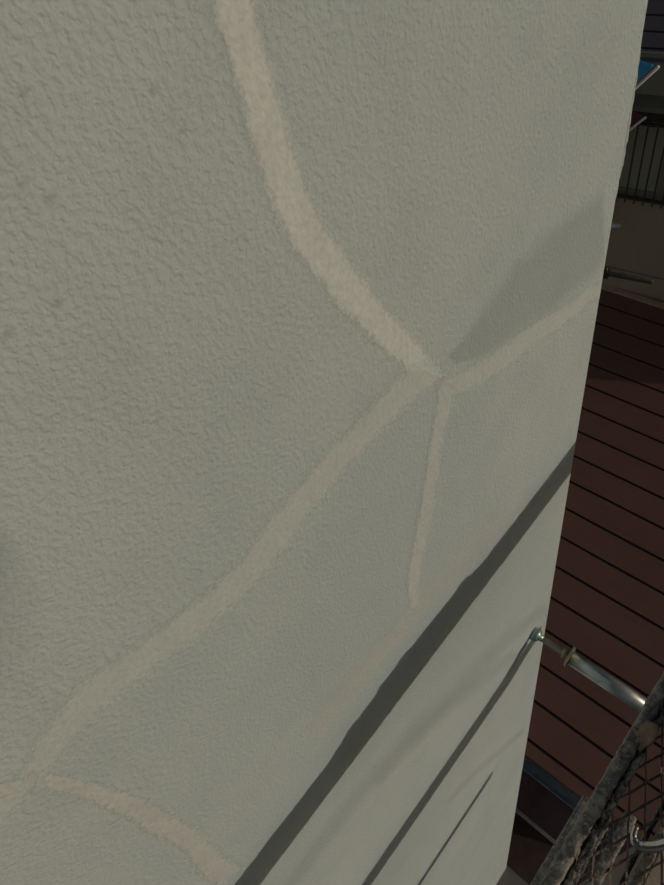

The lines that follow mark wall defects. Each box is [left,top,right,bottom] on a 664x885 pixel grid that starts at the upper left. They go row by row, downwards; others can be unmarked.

crack [0,0,443,885]
crack [408,286,599,609]